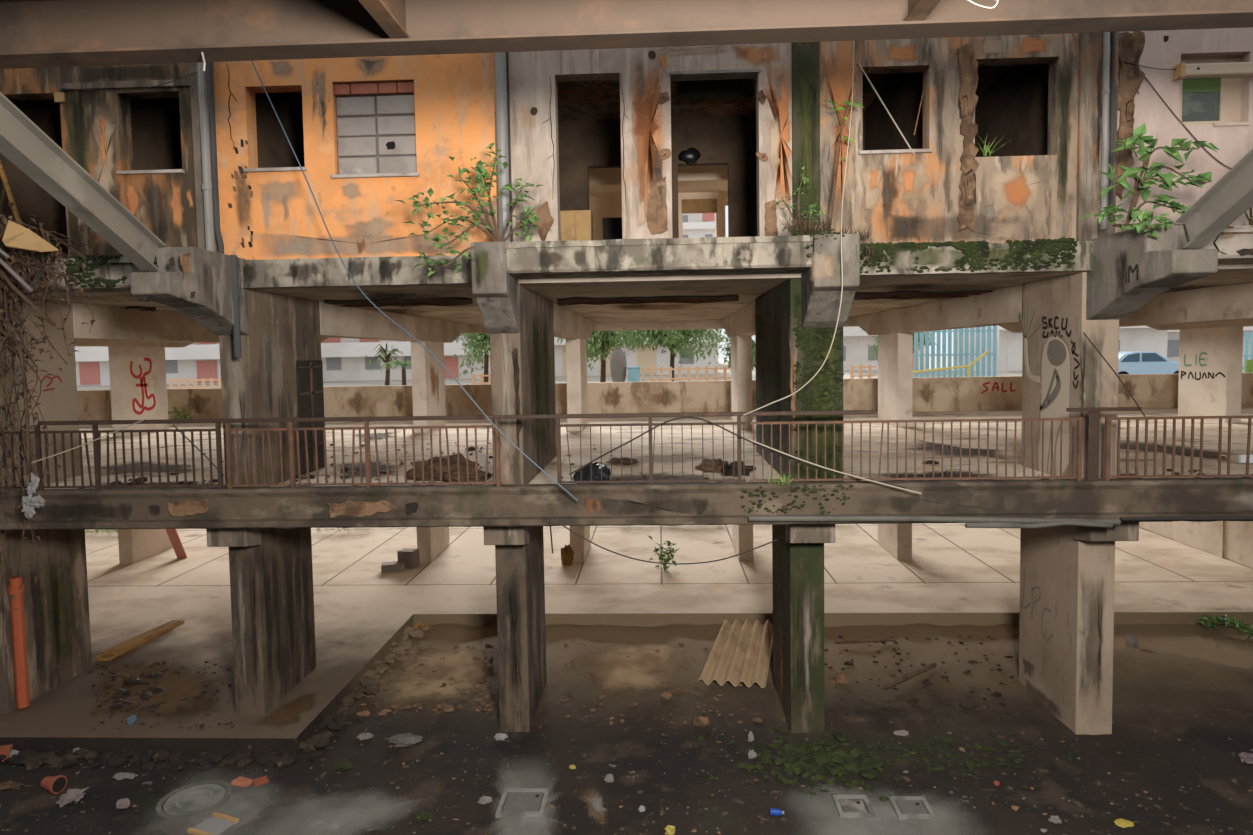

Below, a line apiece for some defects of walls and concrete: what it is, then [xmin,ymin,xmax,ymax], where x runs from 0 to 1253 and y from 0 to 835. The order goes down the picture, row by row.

leakage [94,65,162,79]
leakage [145,190,167,236]
peeling [228,139,253,248]
leakage [243,265,257,280]
leakage [278,219,456,281]
leakage [475,201,498,228]
flaking render [519,201,554,241]
rust [634,90,662,208]
peeling [634,51,671,235]
peeling [756,76,790,236]
peeling [822,66,882,210]
flaking render [957,38,1040,232]